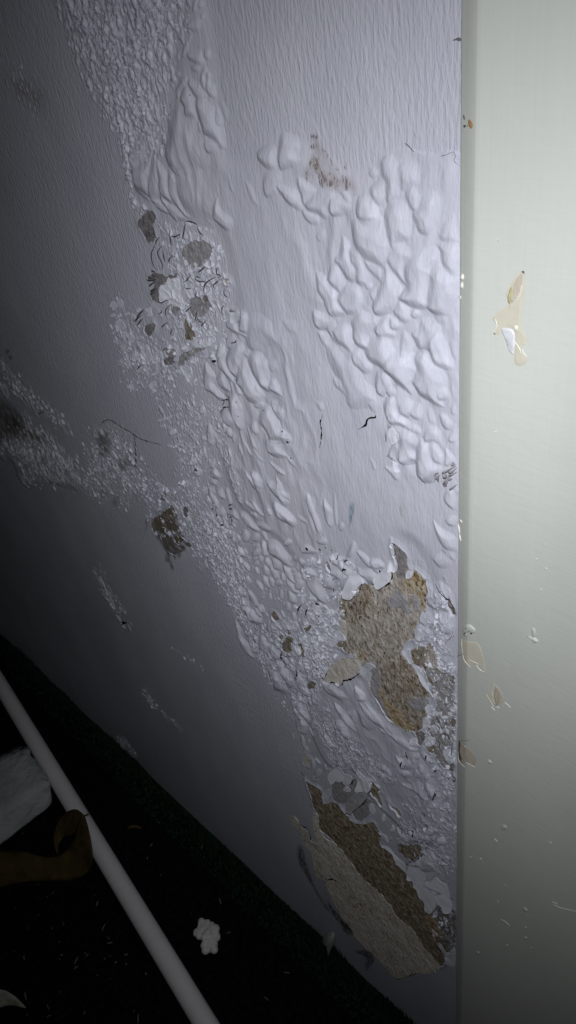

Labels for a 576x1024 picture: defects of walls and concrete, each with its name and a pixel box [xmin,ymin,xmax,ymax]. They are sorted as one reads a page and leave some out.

peeling [0,0,297,719]
peeling [493,271,527,366]
spalling [269,544,485,979]